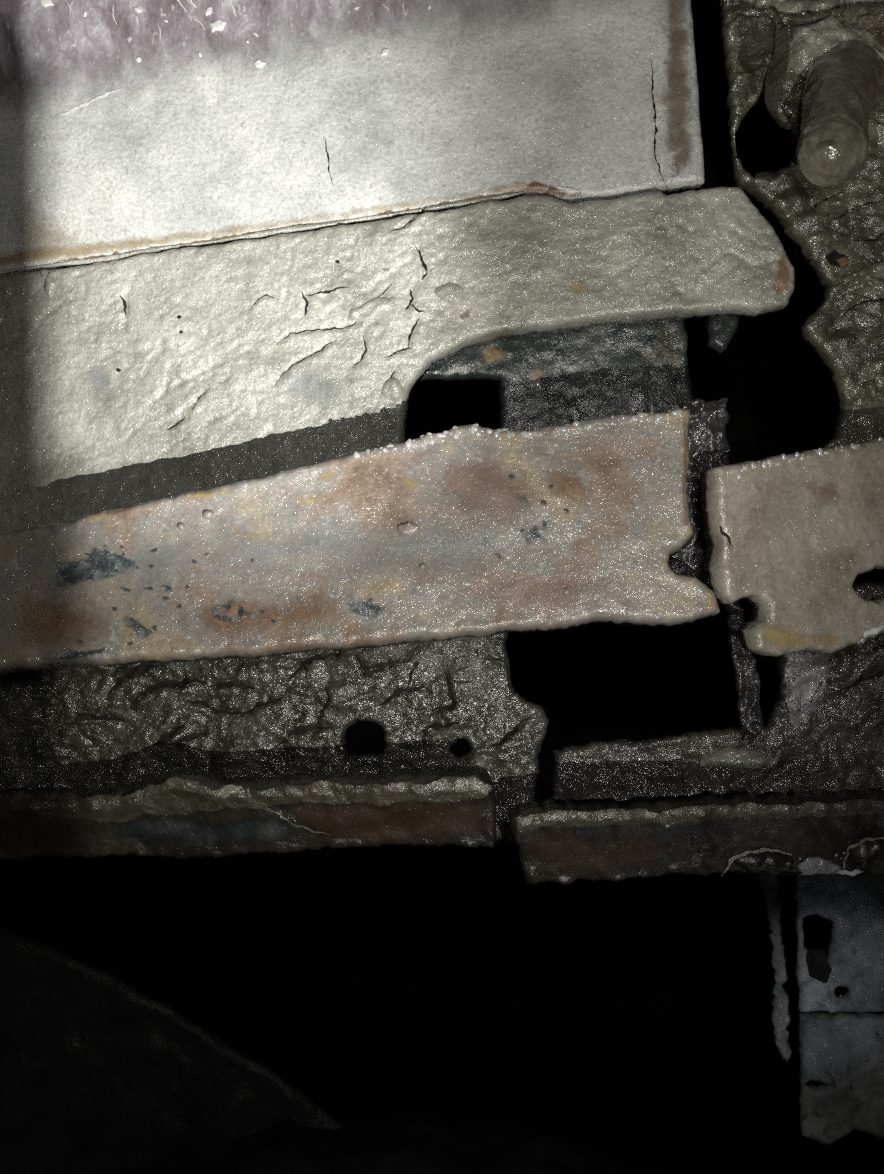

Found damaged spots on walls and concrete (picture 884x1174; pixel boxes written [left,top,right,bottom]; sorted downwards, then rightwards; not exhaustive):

corrosion [663,0,689,173]
crack [651,60,668,190]
spalling [826,250,850,267]
crack [275,205,428,386]
crack [167,388,210,430]
peeling [668,398,731,586]
peeling [57,546,157,587]
peeling [113,607,158,646]
peeling [211,601,276,626]
corrosion [202,602,335,634]
peeling [350,597,384,618]
peeling [723,600,763,742]